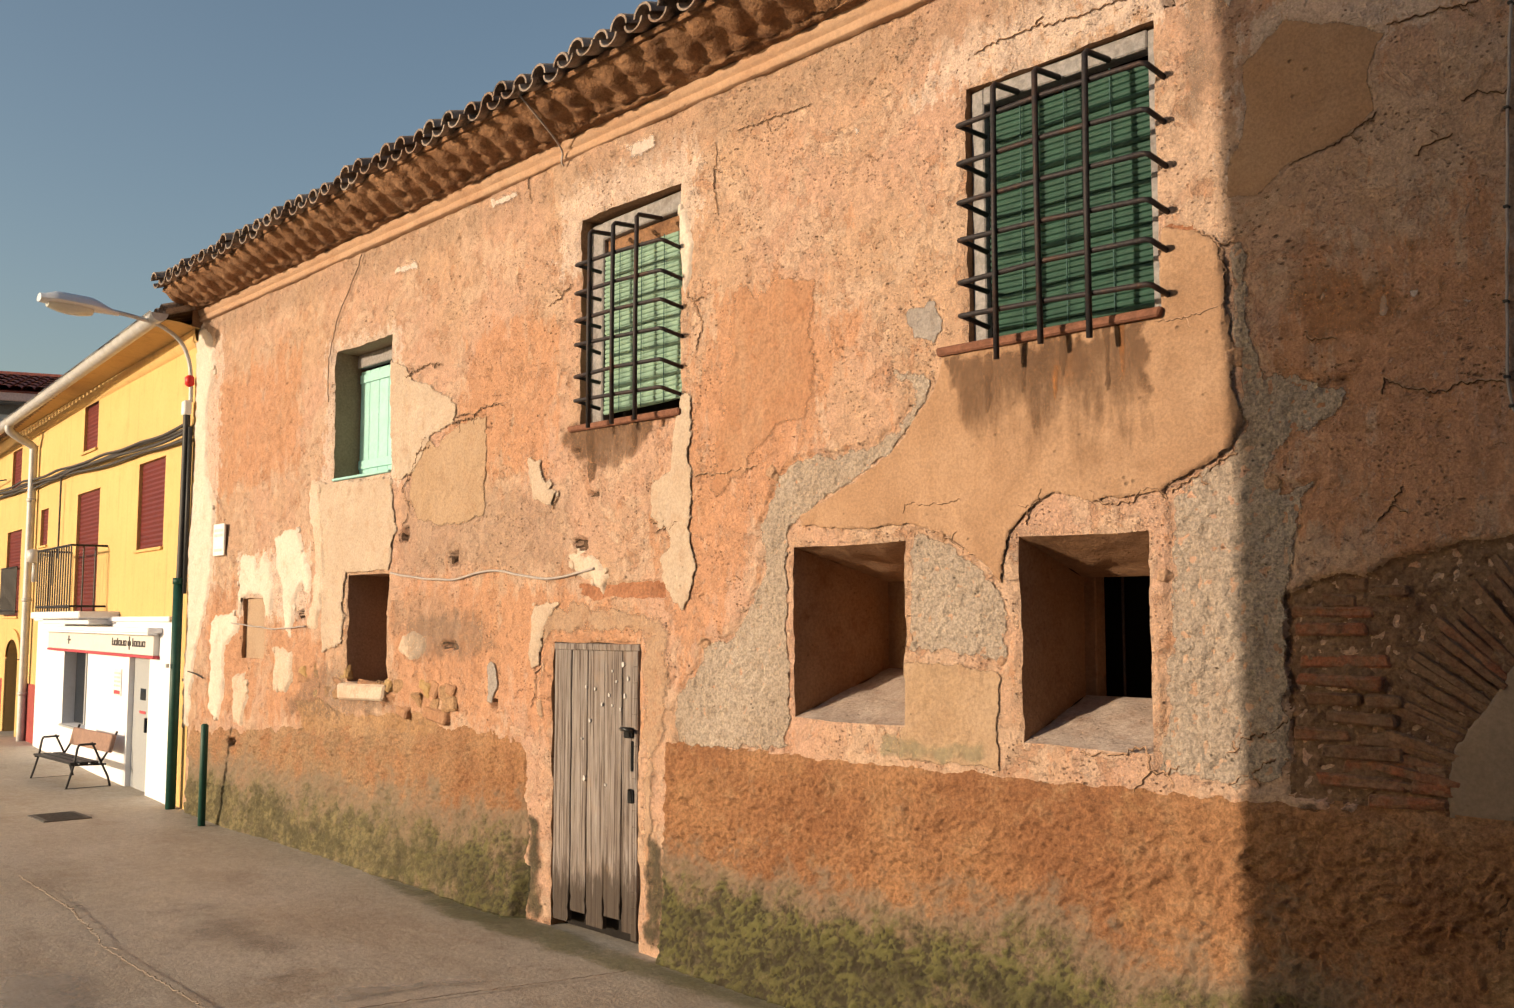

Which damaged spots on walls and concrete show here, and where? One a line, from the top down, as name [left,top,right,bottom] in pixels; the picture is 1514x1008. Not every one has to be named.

crack [974,0,1126,55]
crack [1386,0,1479,25]
water stain [945,320,1150,421]
crack [1381,376,1504,394]
flaking render [181,324,435,740]
flaking render [527,457,558,505]
flaking render [569,388,695,610]
spalling [675,369,930,750]
spalling [1157,242,1514,817]